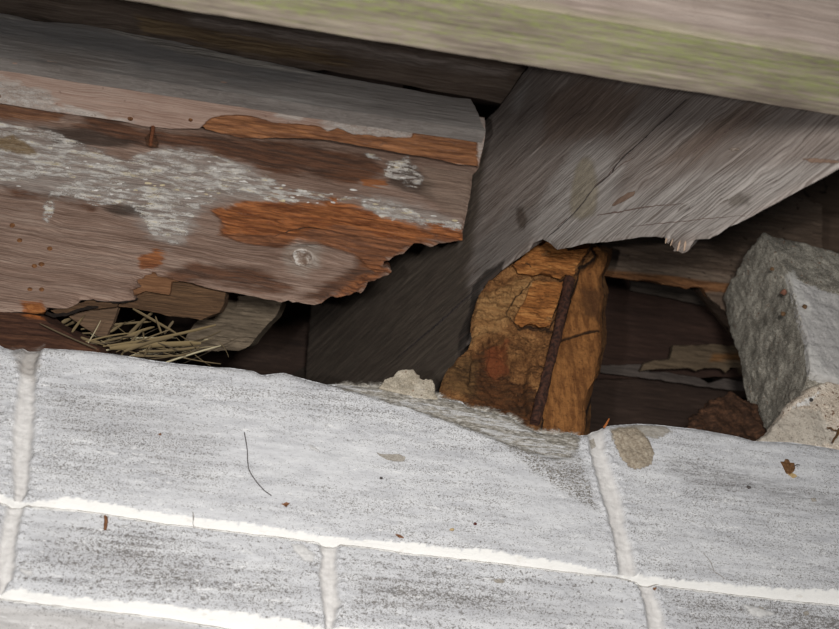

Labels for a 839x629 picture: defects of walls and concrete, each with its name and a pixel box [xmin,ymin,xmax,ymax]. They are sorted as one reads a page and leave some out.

peeling [0,122,462,244]
crack [0,503,839,606]